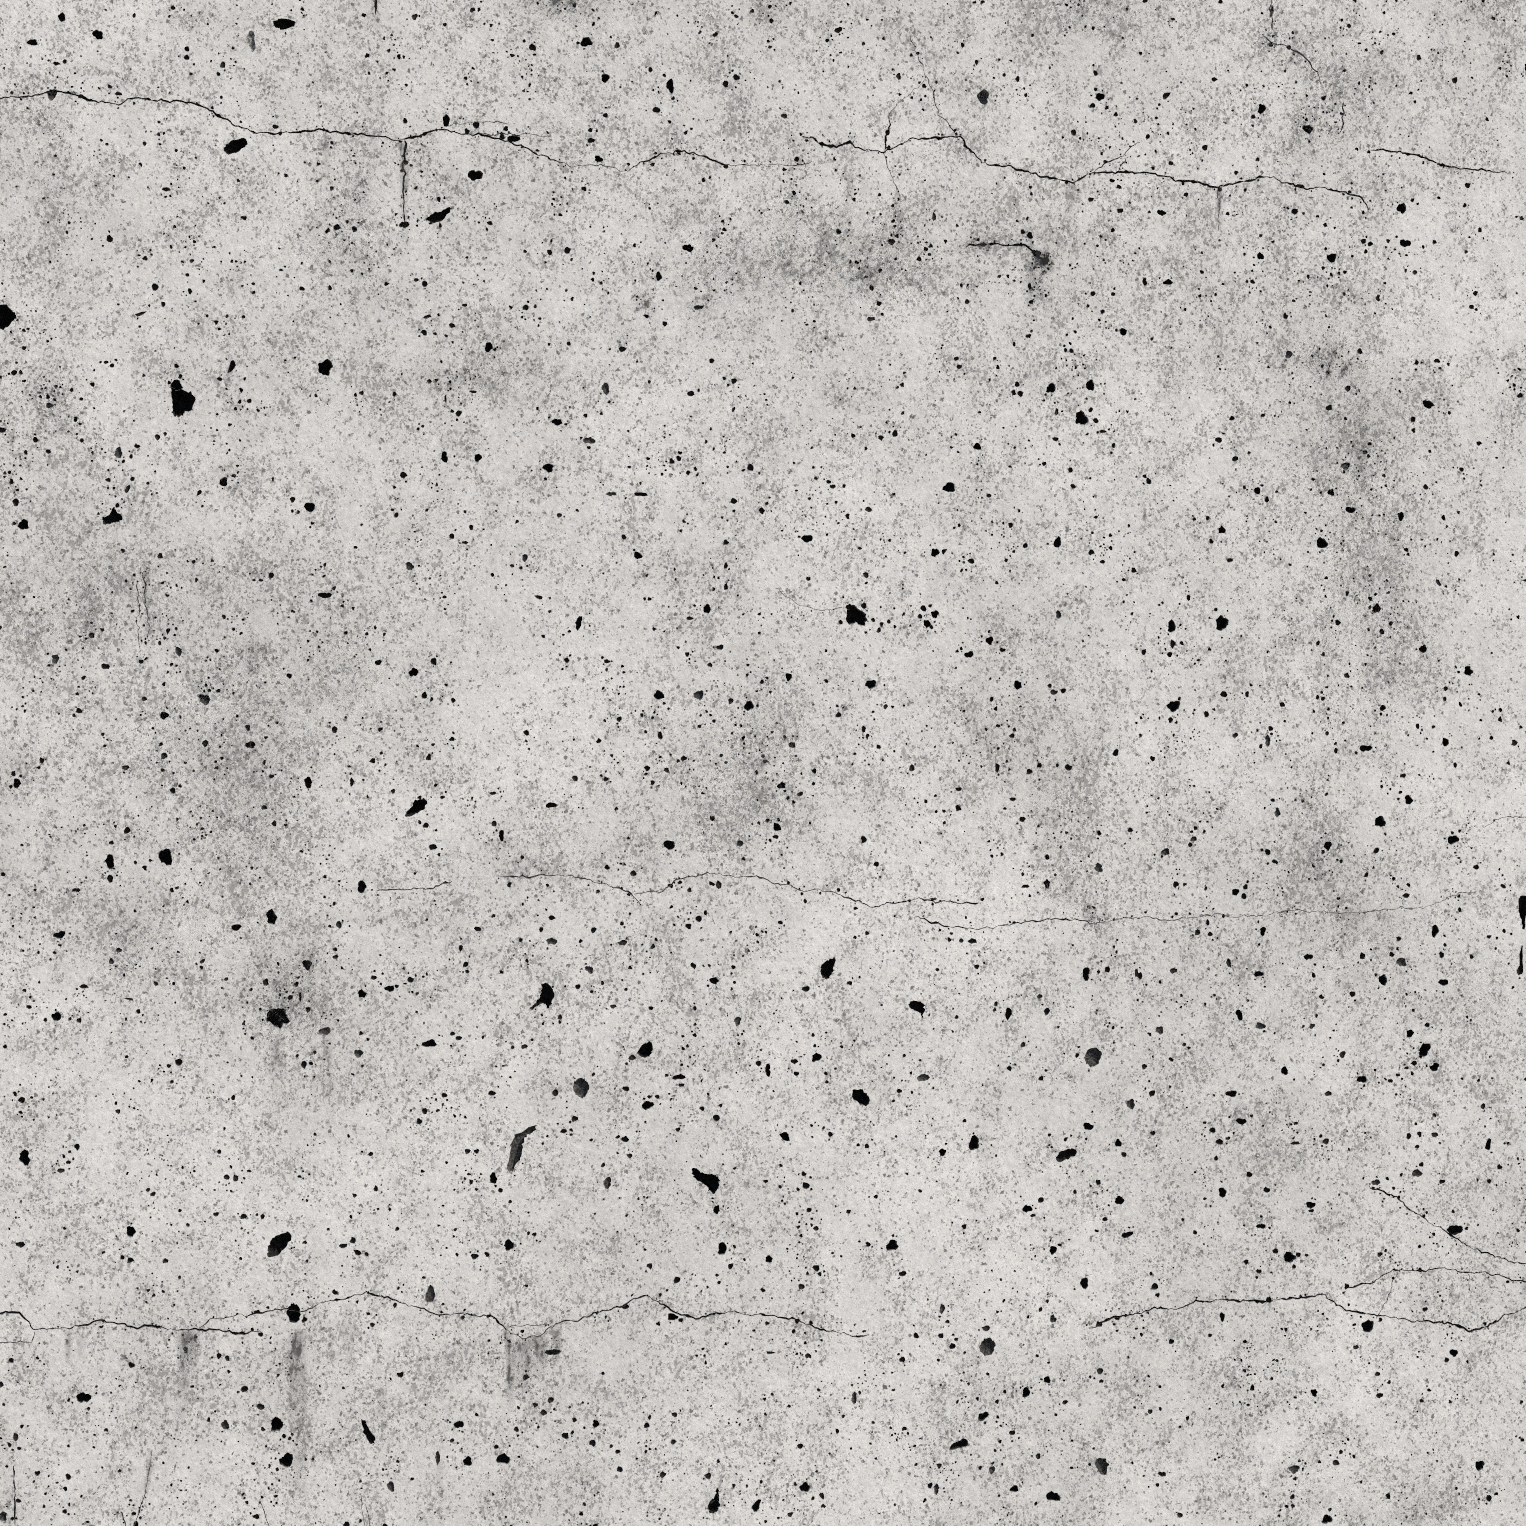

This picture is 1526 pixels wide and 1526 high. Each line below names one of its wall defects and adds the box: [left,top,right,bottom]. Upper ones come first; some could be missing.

crack [0,36,1369,230]
crack [1372,148,1510,174]
crack [966,242,1035,253]
crack [1089,1186,1526,1332]
crack [0,1291,867,1343]